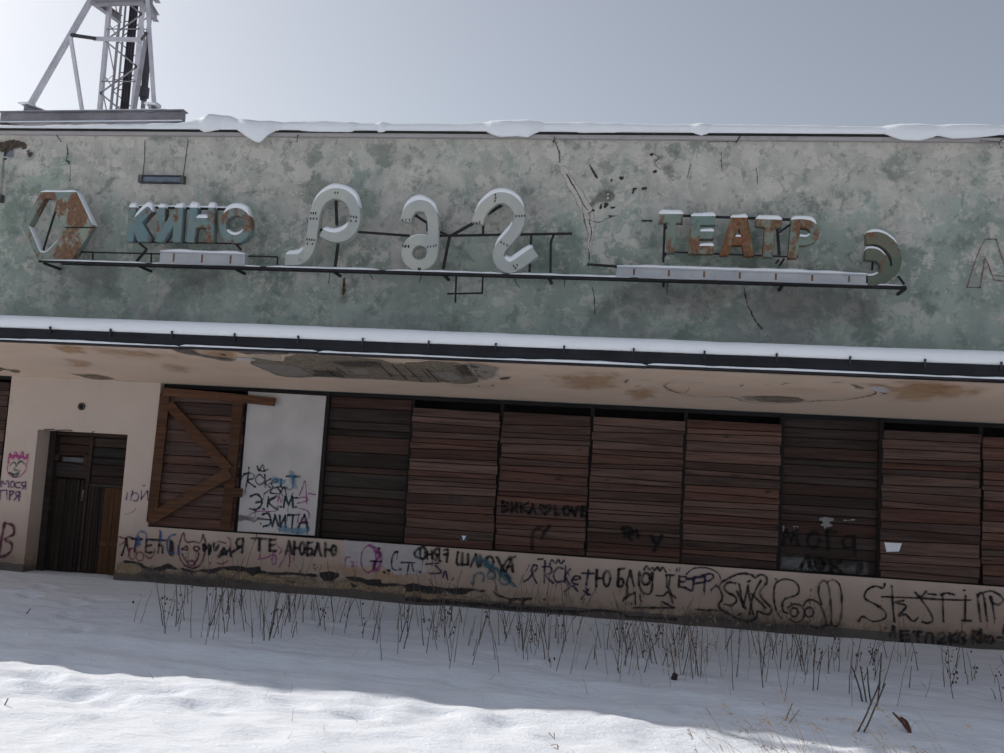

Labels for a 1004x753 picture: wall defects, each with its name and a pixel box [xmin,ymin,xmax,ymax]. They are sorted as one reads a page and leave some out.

peeling [0,139,33,157]
crack [553,137,617,314]
spalling [172,349,511,387]